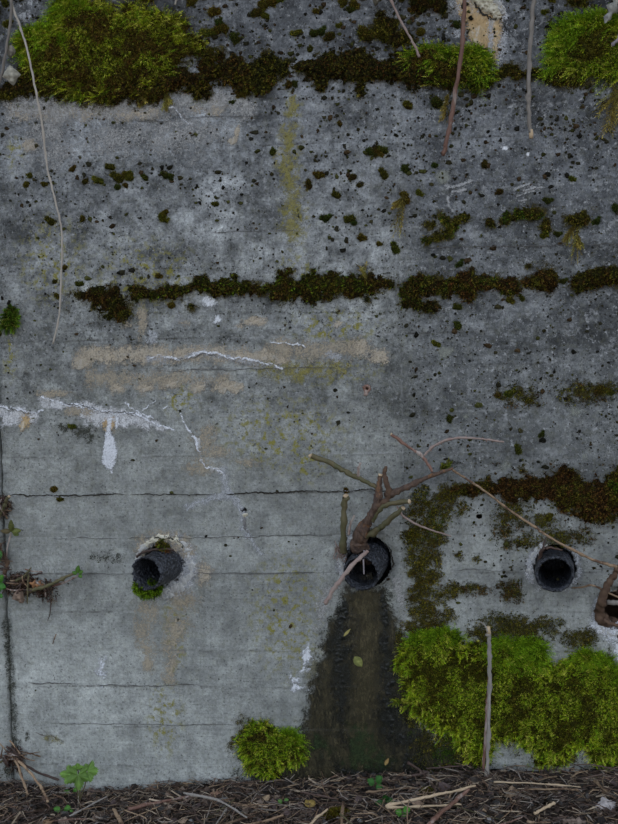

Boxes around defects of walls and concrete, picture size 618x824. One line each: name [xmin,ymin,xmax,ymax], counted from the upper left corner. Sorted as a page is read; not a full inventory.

damp [71,307,390,396]
damp [230,575,475,783]